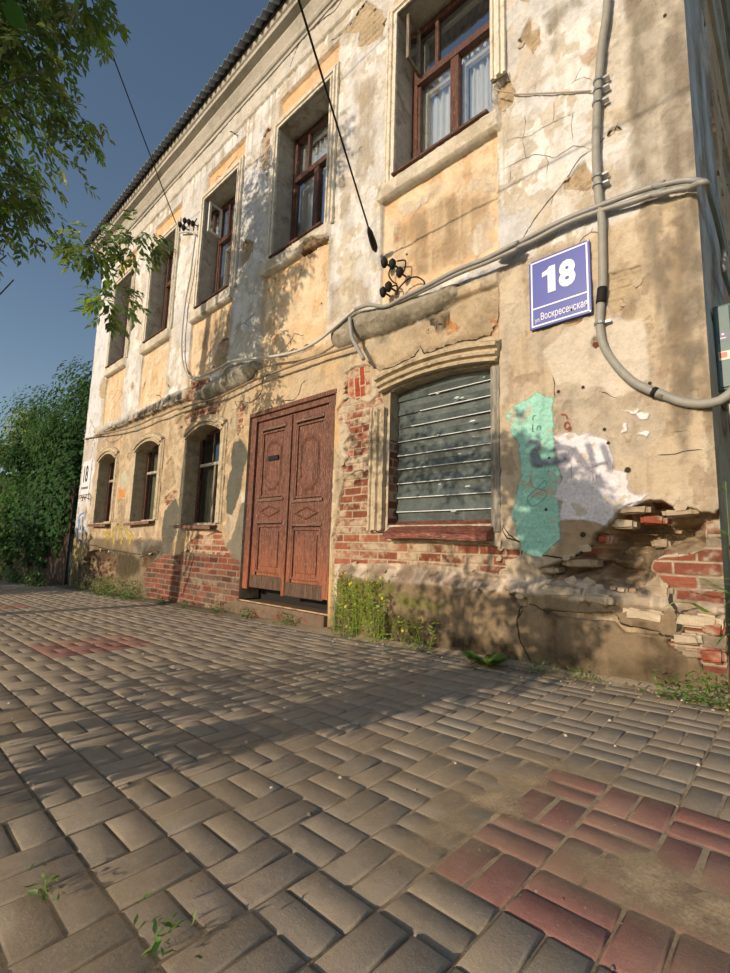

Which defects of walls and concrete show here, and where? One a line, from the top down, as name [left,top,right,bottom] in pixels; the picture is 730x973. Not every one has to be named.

spalling [337,2,387,47]
spalling [517,19,541,54]
spalling [333,365,520,574]
spalling [82,548,117,581]
spalling [143,530,240,608]
spalling [535,502,729,674]
crack [516,604,551,661]